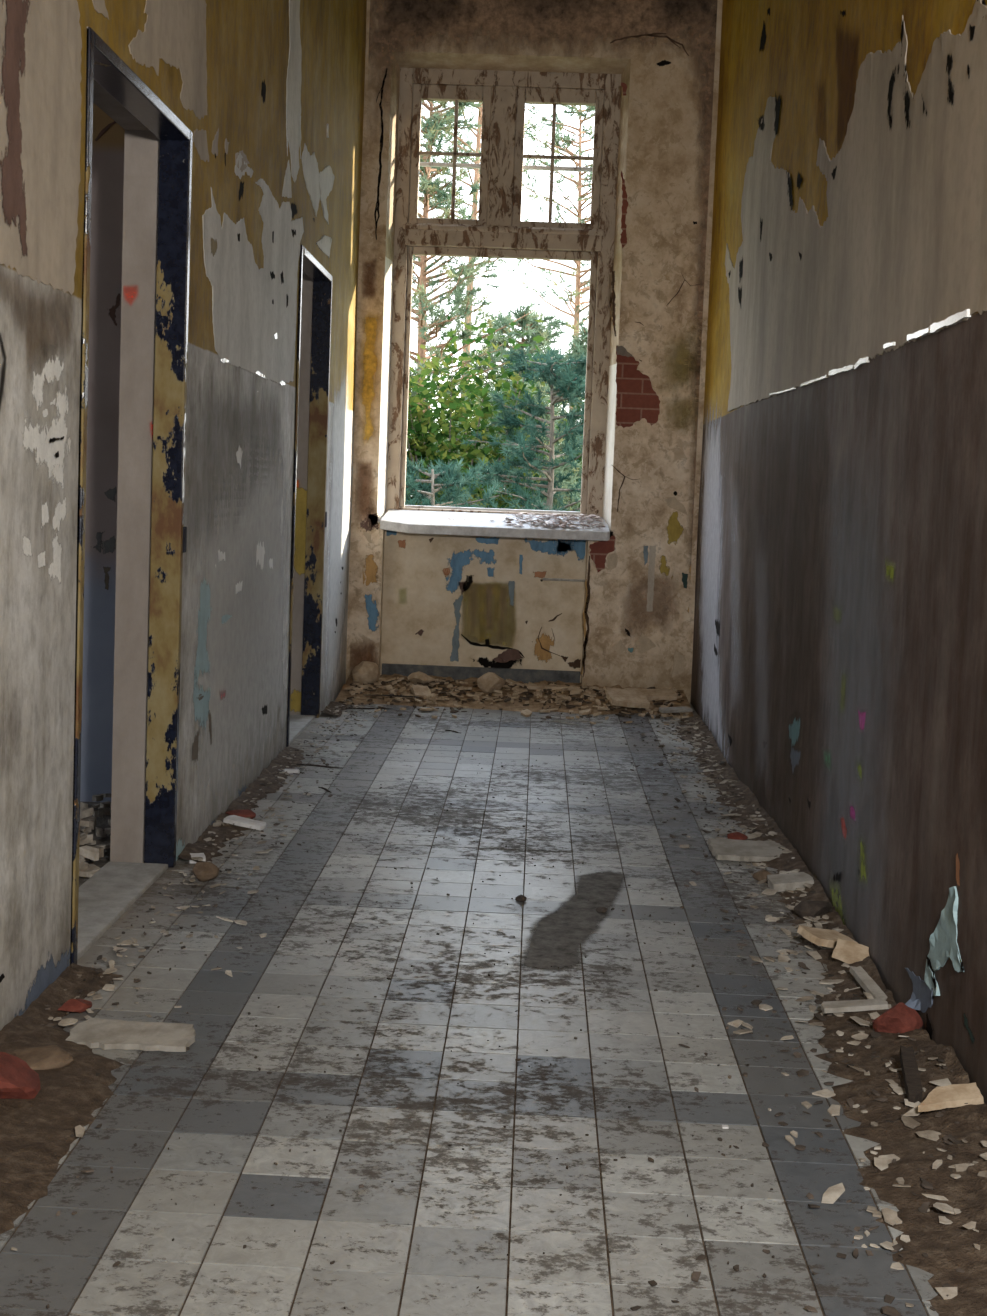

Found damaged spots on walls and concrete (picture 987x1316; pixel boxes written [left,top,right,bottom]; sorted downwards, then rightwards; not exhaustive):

peeling [0,0,109,295]
peeling [128,0,335,392]
peeling [725,0,987,412]
crack [0,335,8,407]
leakage [369,0,725,758]
flaking render [611,271,660,428]
peeling [443,537,581,669]
peeling [508,531,618,606]
peeling [646,712,987,1179]
peeling [821,1183,845,1204]
peeling [854,1187,910,1270]
peeling [859,1146,980,1250]